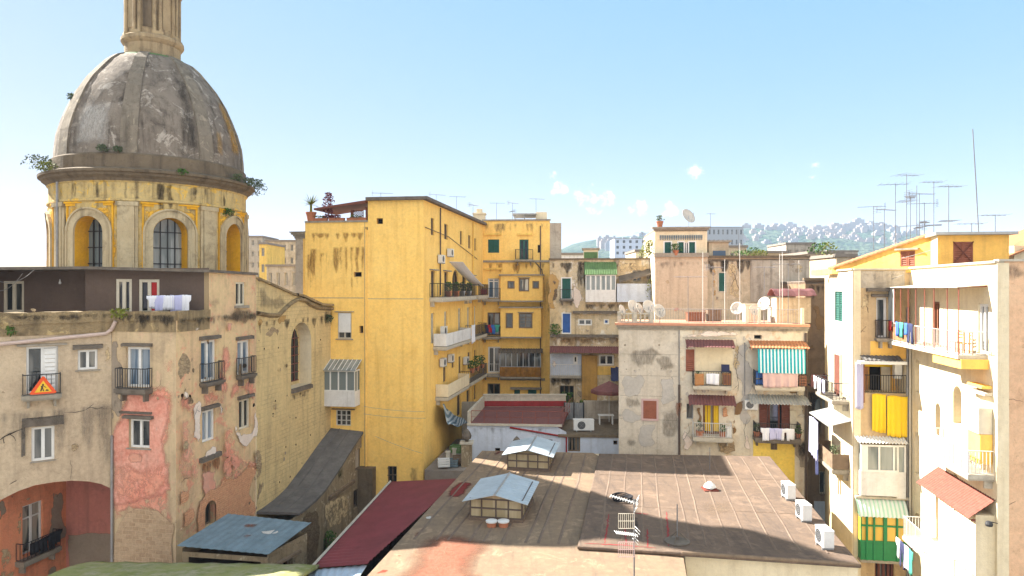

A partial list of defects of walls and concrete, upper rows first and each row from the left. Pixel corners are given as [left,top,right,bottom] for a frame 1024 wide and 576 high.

water stain [128,315,239,325]
flaking render [180,413,263,532]